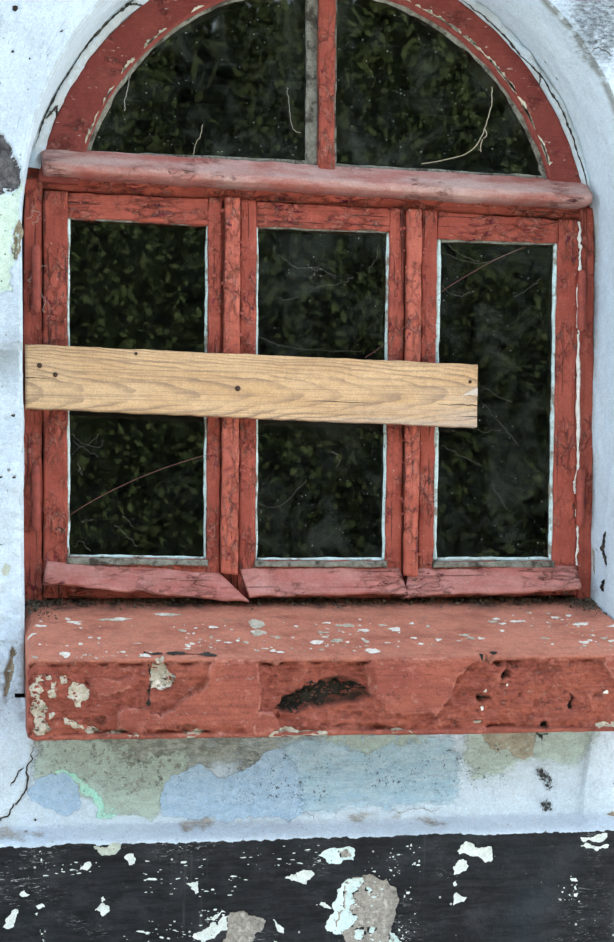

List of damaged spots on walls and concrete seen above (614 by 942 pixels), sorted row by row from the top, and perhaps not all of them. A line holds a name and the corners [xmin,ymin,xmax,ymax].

damp [573,0,614,60]
peeling [0,134,24,293]
peeling [29,675,139,737]
crack [0,751,33,821]
peeling [3,909,18,929]
peeling [39,843,162,893]
peeling [95,897,110,916]
peeling [124,909,284,942]
peeling [273,845,355,884]
peeling [317,844,420,942]
peeling [453,841,493,905]
peeling [581,833,609,851]